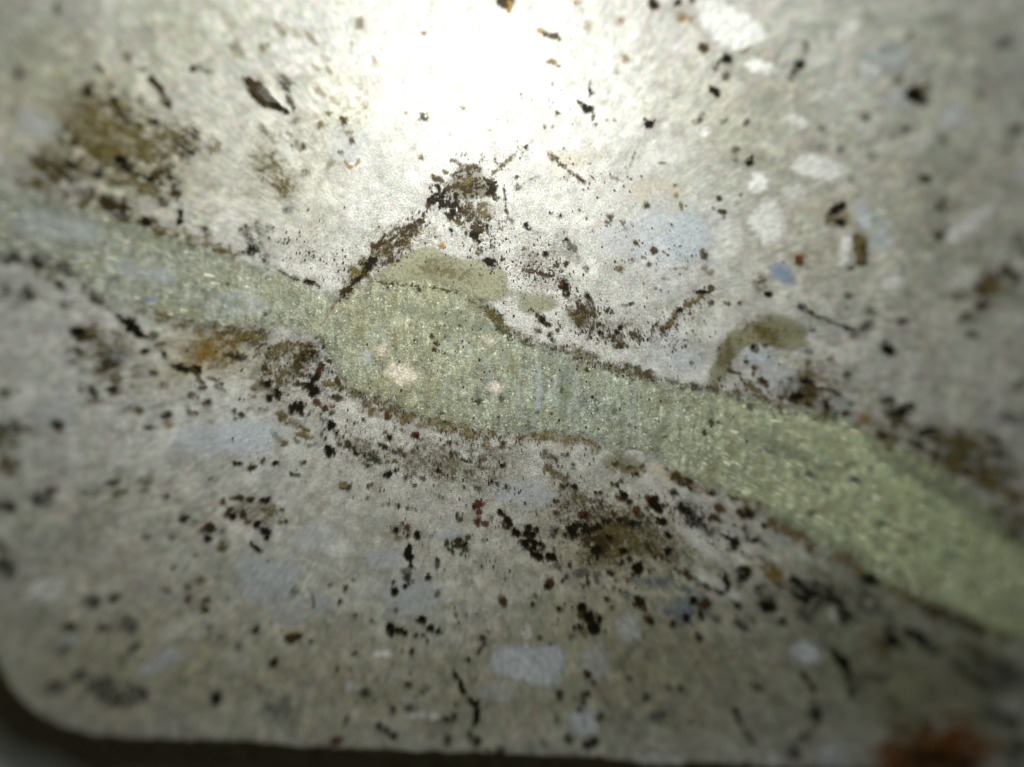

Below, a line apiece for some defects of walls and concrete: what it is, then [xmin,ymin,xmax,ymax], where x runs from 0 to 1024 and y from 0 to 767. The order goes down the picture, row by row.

damp [17,64,222,224]
damp [242,222,266,263]
damp [848,232,867,270]
damp [0,257,72,308]
damp [565,294,596,339]
damp [69,323,145,404]
damp [251,329,346,407]
damp [124,405,173,430]
damp [273,410,316,446]
damp [802,350,1024,540]
damp [541,449,669,586]
damp [723,565,891,626]